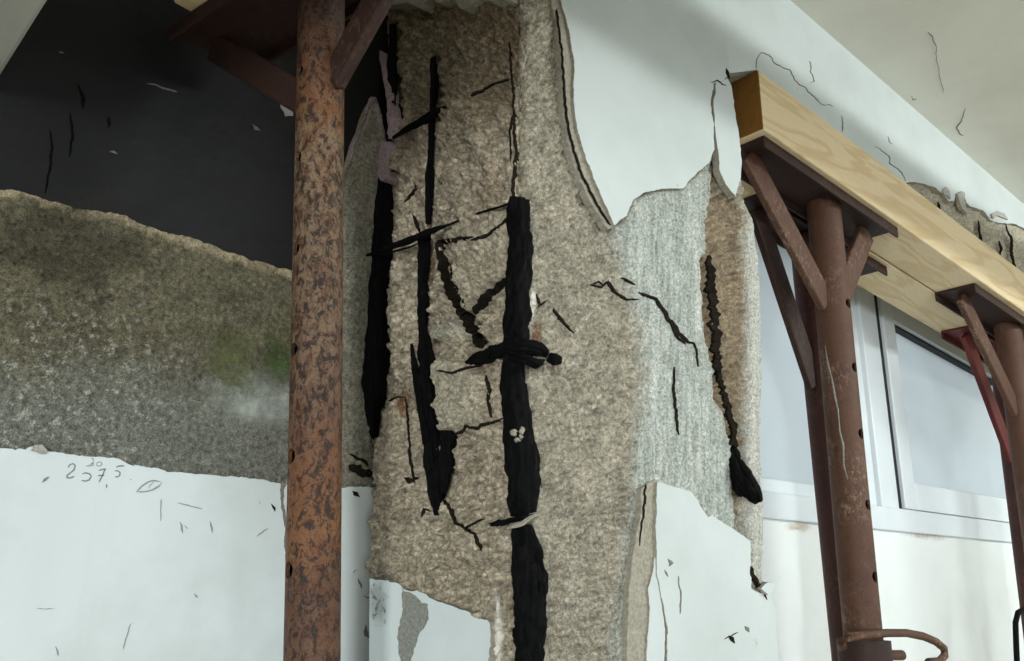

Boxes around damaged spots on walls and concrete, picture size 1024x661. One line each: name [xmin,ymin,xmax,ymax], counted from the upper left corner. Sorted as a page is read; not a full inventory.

crack [556,9,611,225]
crack [756,52,832,106]
crack [390,42,520,436]
spalling [908,183,1024,273]
spalling [0,189,292,493]
spalling [342,0,750,661]
crack [536,294,574,334]
crack [589,255,739,448]
damp [228,388,289,420]
crack [388,396,415,483]
crack [421,499,486,551]
crack [639,485,647,546]